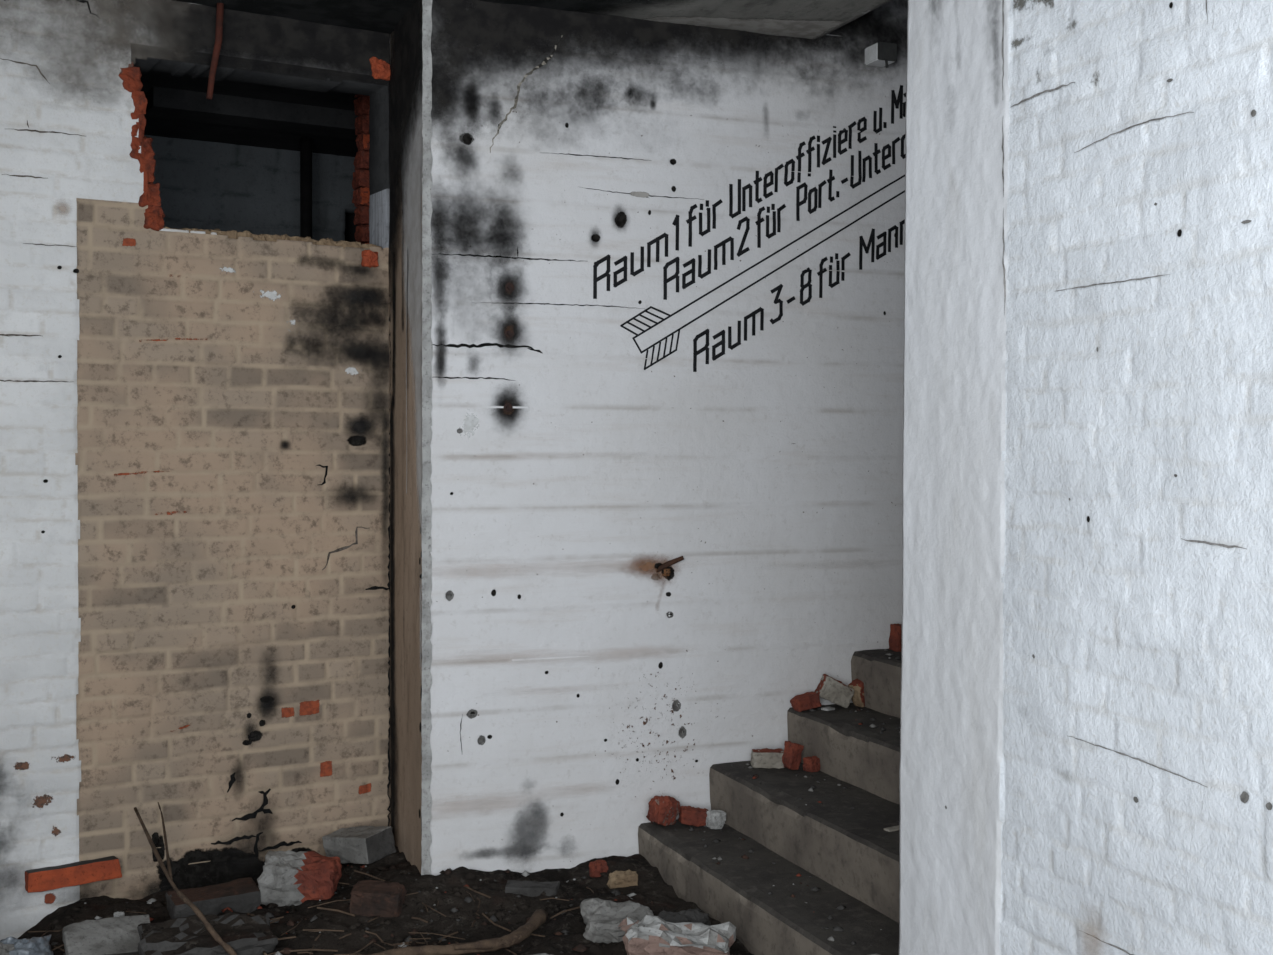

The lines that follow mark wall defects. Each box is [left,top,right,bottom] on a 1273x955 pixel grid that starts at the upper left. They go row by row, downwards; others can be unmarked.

peeling [1014,0,1054,10]
damp [466,85,499,119]
spalling [119,66,383,250]
damp [434,258,446,305]
damp [436,329,446,378]
rust [635,559,671,579]
spalling [243,713,265,745]
spalling [260,696,319,718]
crack [211,772,302,858]
damp [477,805,546,857]